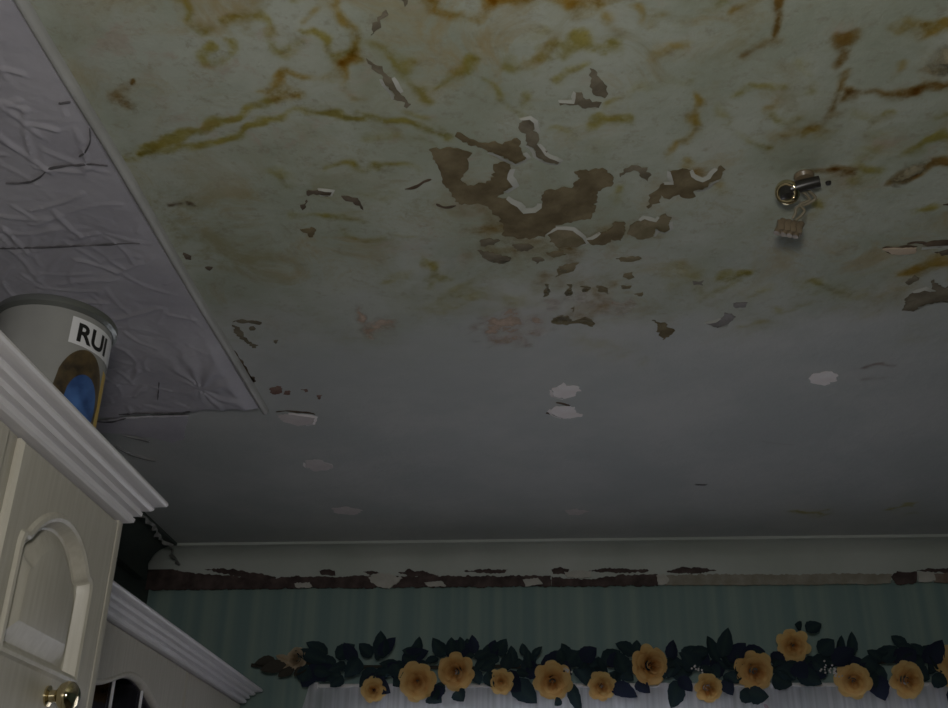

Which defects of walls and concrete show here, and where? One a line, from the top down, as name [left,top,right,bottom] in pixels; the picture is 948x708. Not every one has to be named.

peeling [429,116,725,297]
crack [882,240,948,255]
peeling [902,275,948,313]
peeling [551,307,595,327]
peeling [652,320,675,340]
peeling [809,371,838,386]
peeling [547,382,583,419]
peeling [278,413,318,426]
peeling [145,567,948,591]